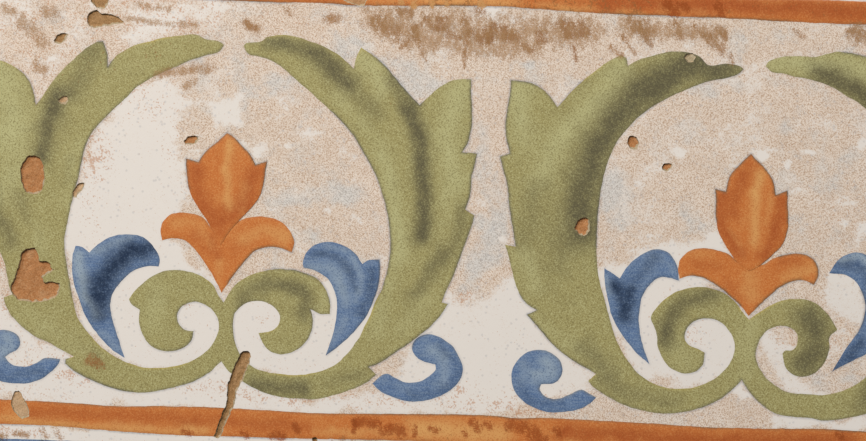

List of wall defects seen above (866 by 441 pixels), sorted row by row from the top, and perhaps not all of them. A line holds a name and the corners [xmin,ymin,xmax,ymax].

peeling [20,155,45,194]
peeling [10,248,60,302]
peeling [11,391,29,419]
crack [214,351,251,438]